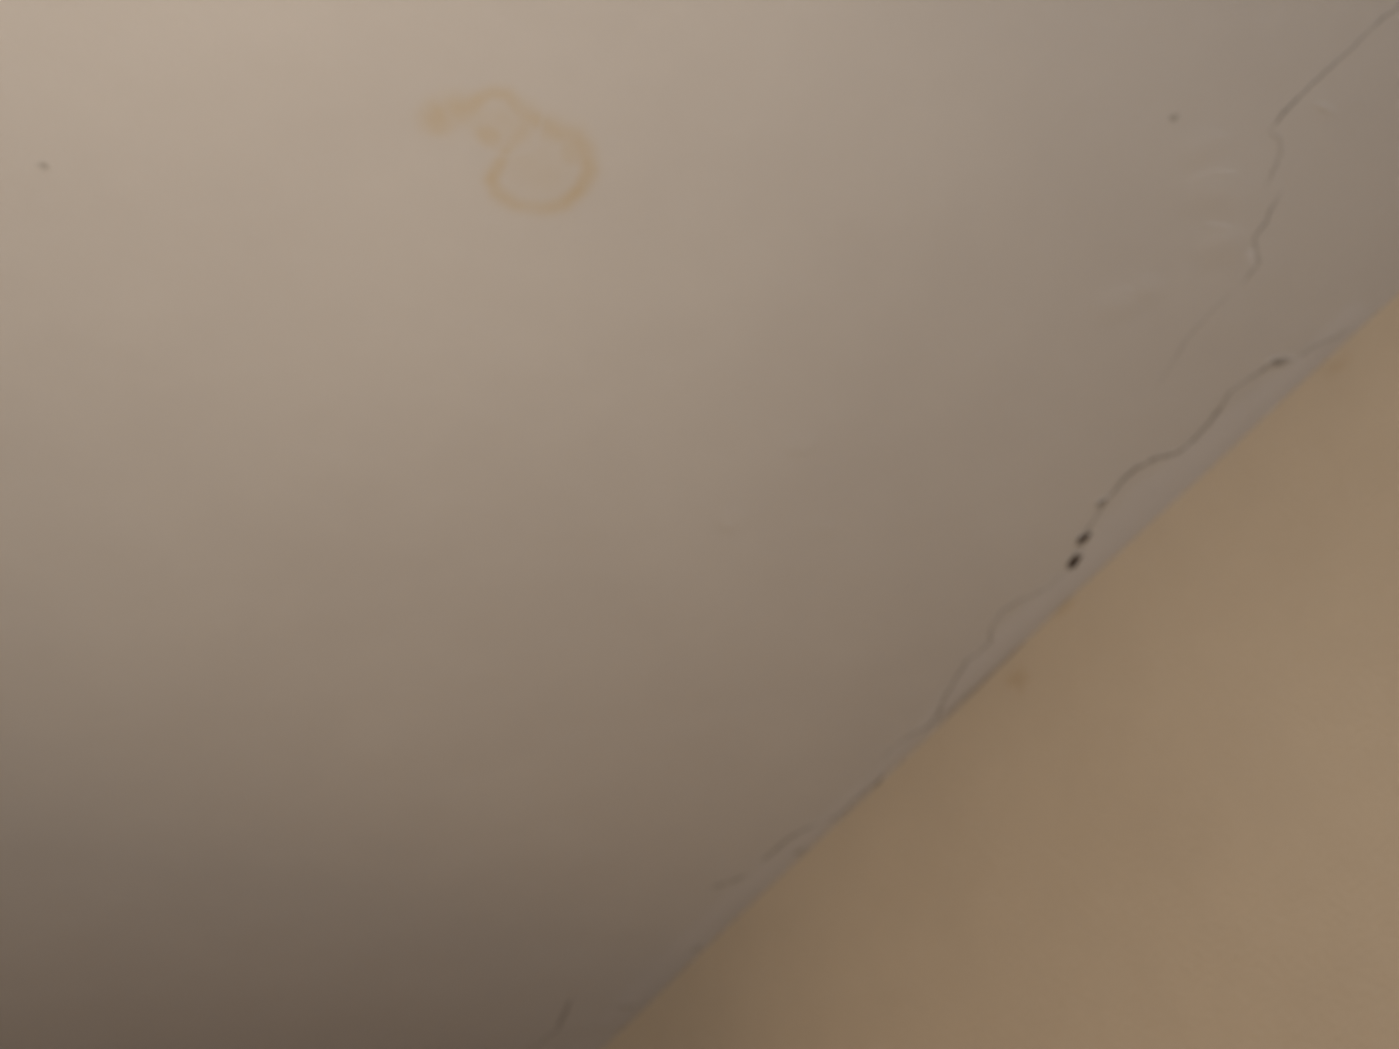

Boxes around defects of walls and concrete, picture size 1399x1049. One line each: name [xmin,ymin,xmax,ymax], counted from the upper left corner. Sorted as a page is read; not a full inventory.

damp [405,76,615,229]
crack [706,324,1356,891]